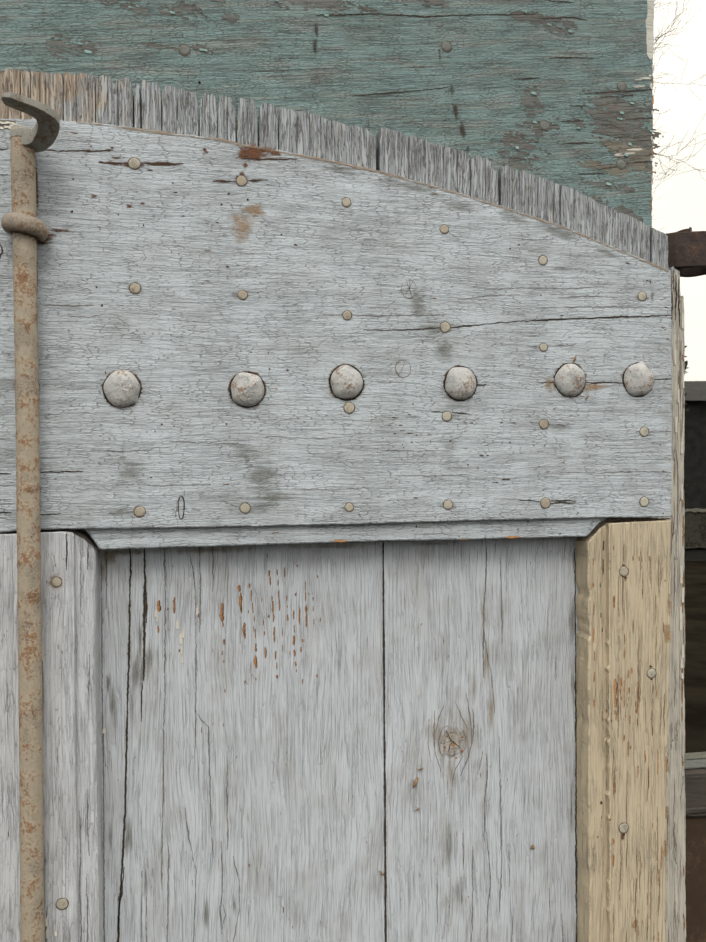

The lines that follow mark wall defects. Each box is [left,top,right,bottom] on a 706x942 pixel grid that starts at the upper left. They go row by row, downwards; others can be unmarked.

peeling [275,0,382,18]
crack [316,0,586,20]
crack [3,43,463,193]
rust [219,143,281,183]
peeling [482,0,664,222]
crack [328,270,680,331]
peeling [674,349,684,453]
crack [565,352,685,736]
peeling [145,597,184,663]
peeling [237,564,321,685]
crack [453,540,513,942]
crack [612,749,676,942]